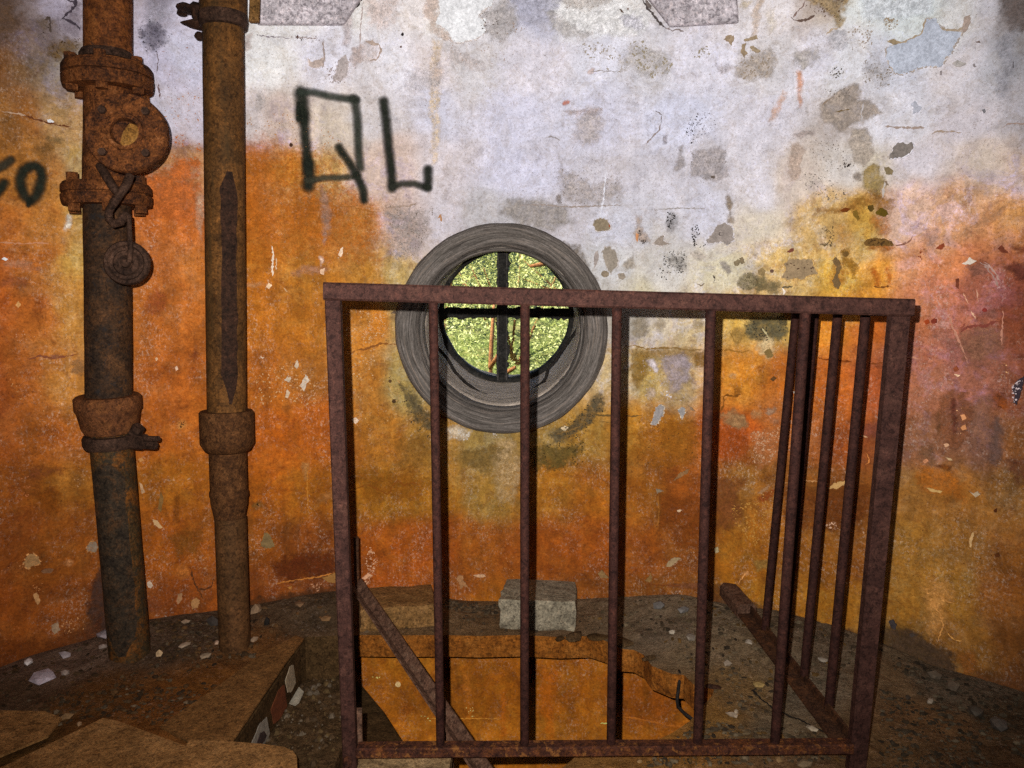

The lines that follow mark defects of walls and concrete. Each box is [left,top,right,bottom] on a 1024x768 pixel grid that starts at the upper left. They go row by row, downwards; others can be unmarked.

peeling [720,35,770,79]
spalling [885,15,976,76]
rust [142,74,201,219]
peeling [691,149,728,181]
peeling [820,85,915,195]
spalling [592,217,612,233]
spalling [691,196,736,260]
spalling [758,248,818,281]
rust [832,250,857,289]
rust [998,245,1024,280]
rust [937,390,974,448]